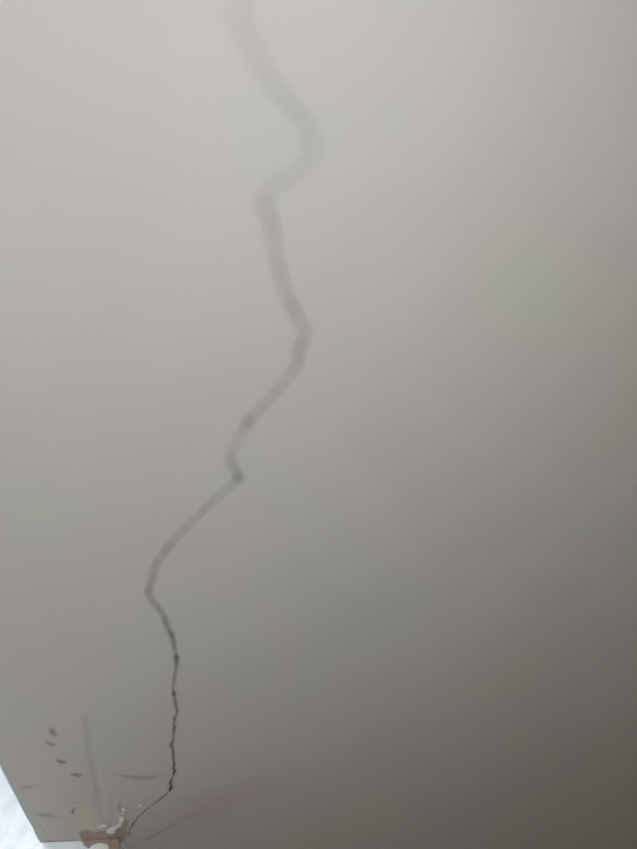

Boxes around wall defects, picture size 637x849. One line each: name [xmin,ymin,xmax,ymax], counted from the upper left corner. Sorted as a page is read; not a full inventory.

spalling [79,799,129,849]
crack [121,0,315,849]